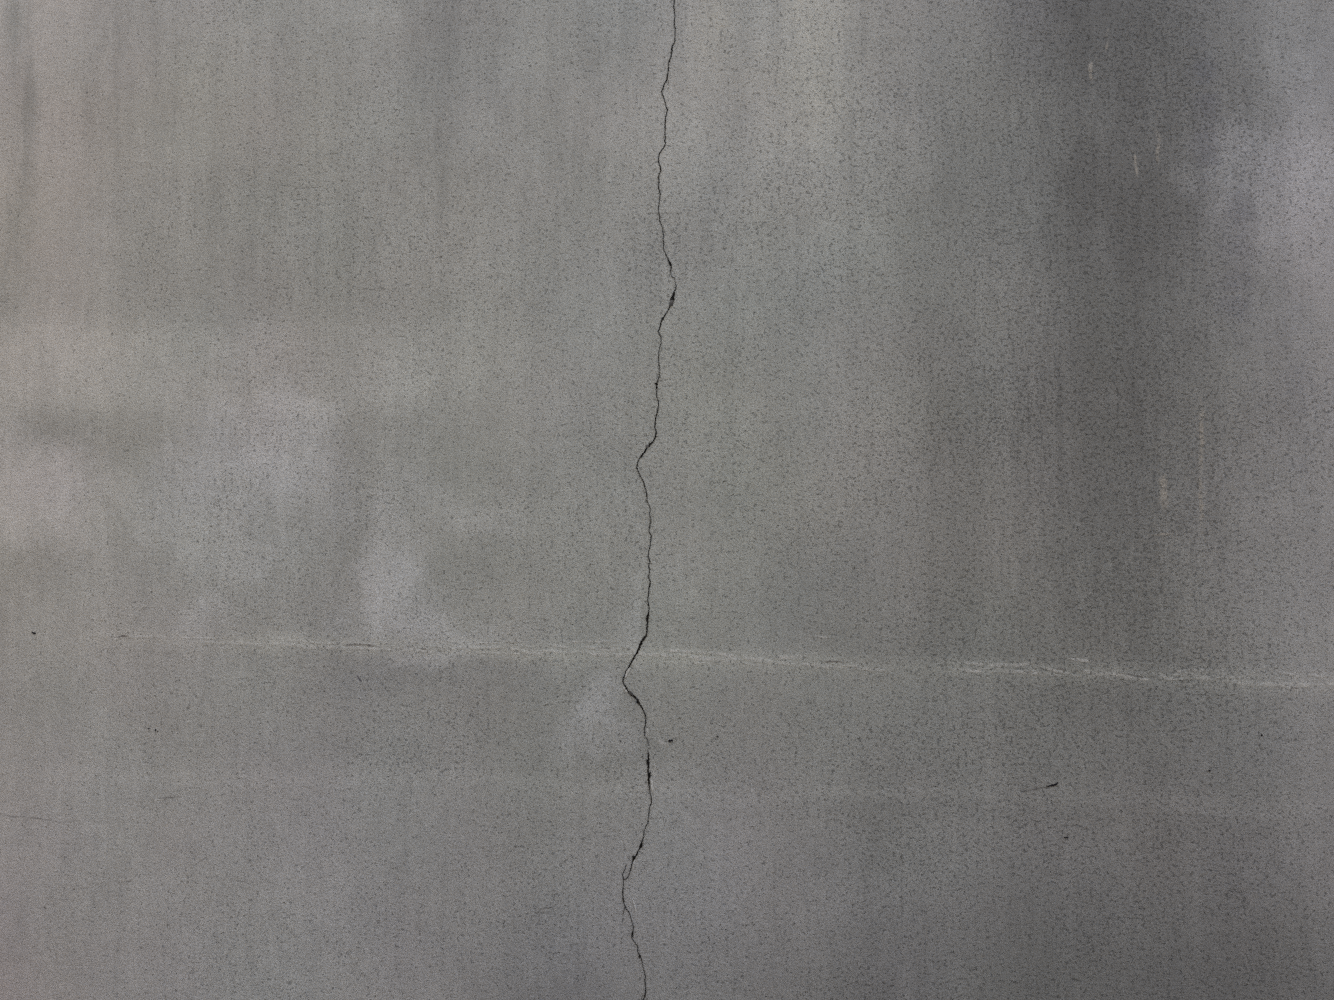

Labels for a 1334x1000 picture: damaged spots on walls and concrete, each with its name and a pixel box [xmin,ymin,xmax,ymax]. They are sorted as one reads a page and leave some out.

crack [622,0,677,1000]